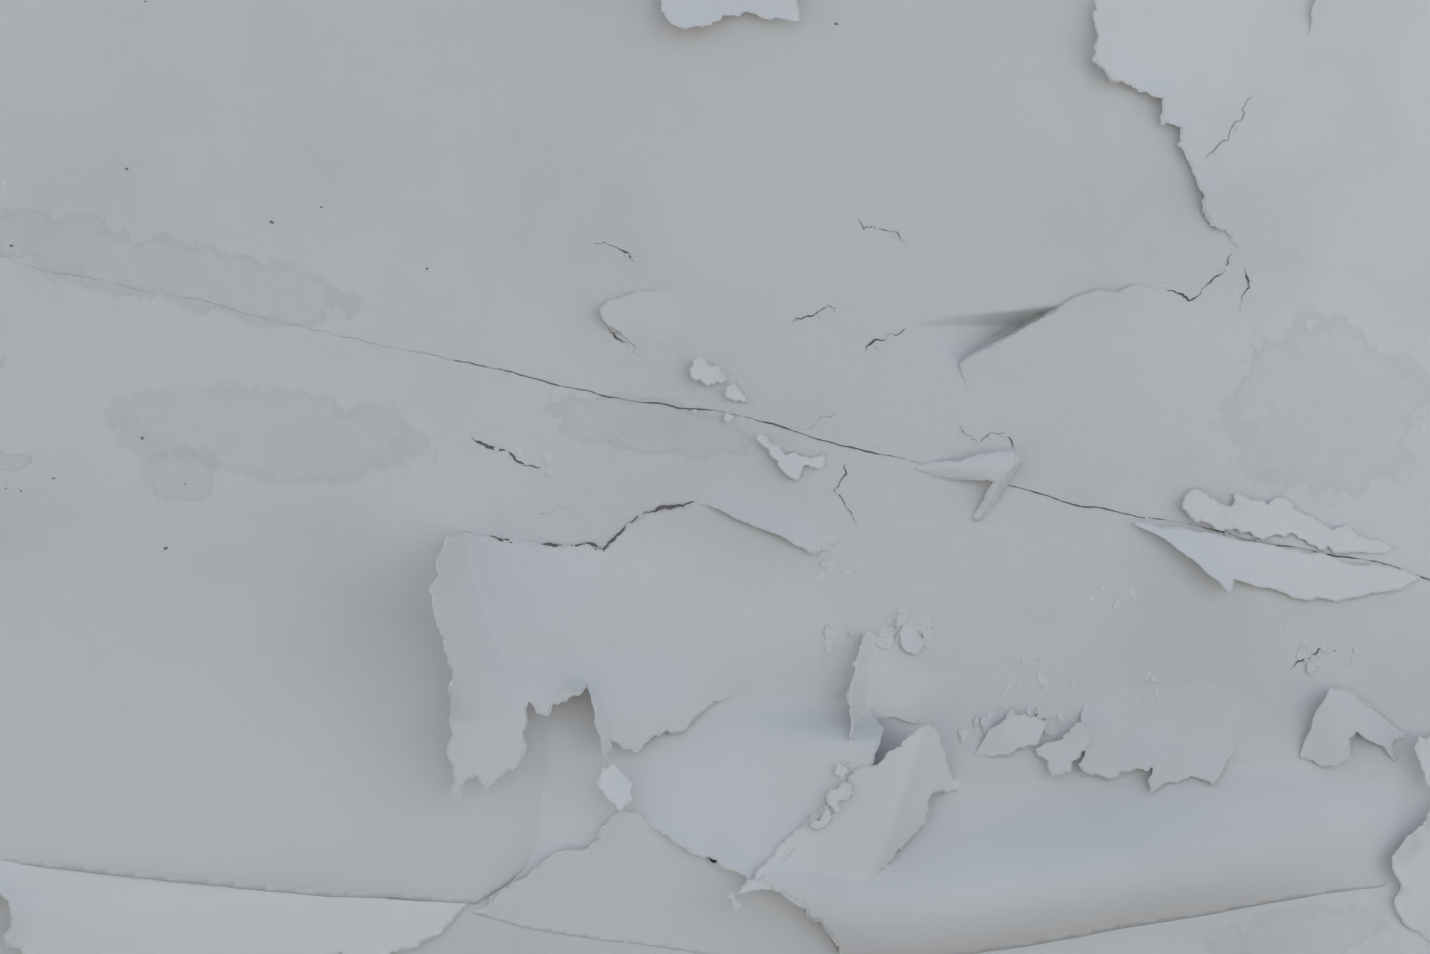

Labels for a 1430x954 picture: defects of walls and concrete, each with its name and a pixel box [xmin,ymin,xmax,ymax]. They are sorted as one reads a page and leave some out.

peeling [661,0,801,29]
crack [1205,92,1259,159]
peeling [1091,0,1430,272]
crack [594,242,638,261]
crack [1150,257,1253,309]
crack [0,255,920,525]
peeling [959,283,1248,442]
crack [489,501,694,552]
crack [987,480,1430,580]
peeling [1133,488,1421,602]
peeling [0,502,966,954]
peeling [958,677,1249,792]